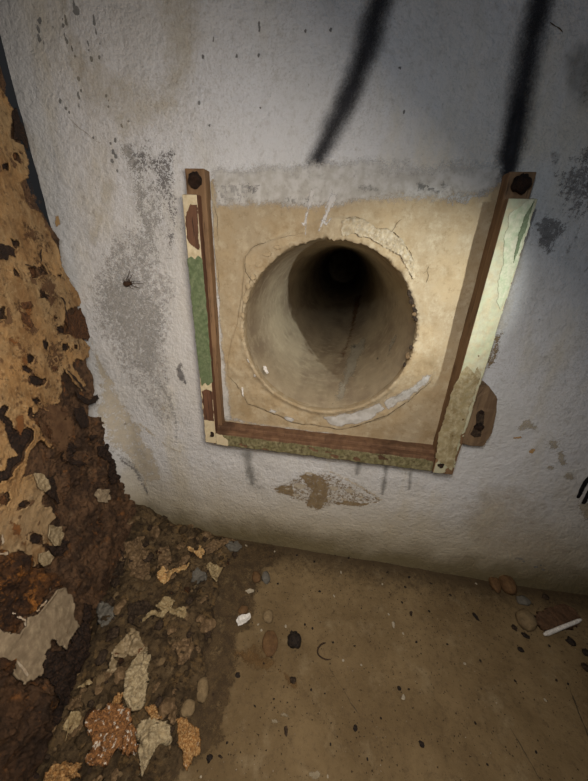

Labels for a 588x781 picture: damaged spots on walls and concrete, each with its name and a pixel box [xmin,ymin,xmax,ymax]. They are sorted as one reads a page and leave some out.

damp [535,148,588,254]
peeling [0,87,160,567]
damp [93,139,185,438]
spalling [274,471,379,511]
peeling [0,587,80,685]